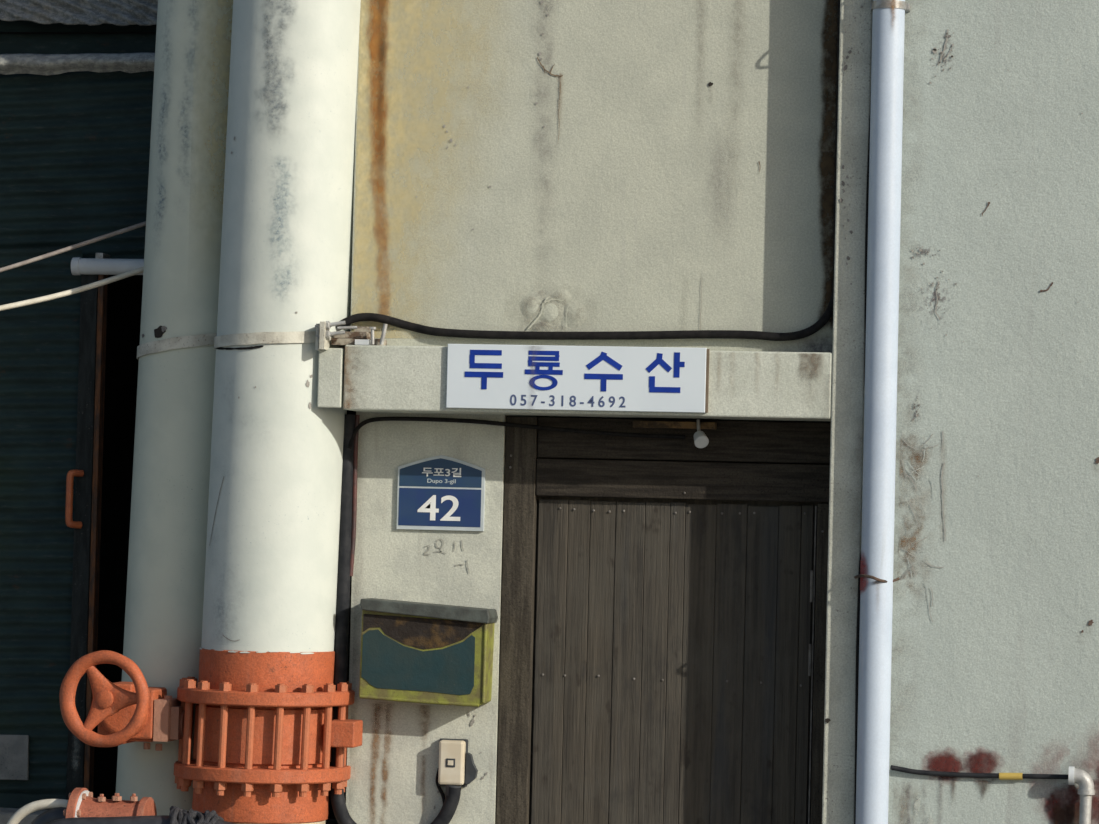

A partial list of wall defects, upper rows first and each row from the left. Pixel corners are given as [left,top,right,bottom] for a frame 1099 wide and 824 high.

crack [537,57,563,139]
corrosion [353,0,451,338]
water stain [819,0,838,328]
water stain [801,340,833,375]
corrosion [860,557,876,592]
corrosion [371,706,390,814]
corrosion [929,753,996,791]
corrosion [1046,761,1099,824]